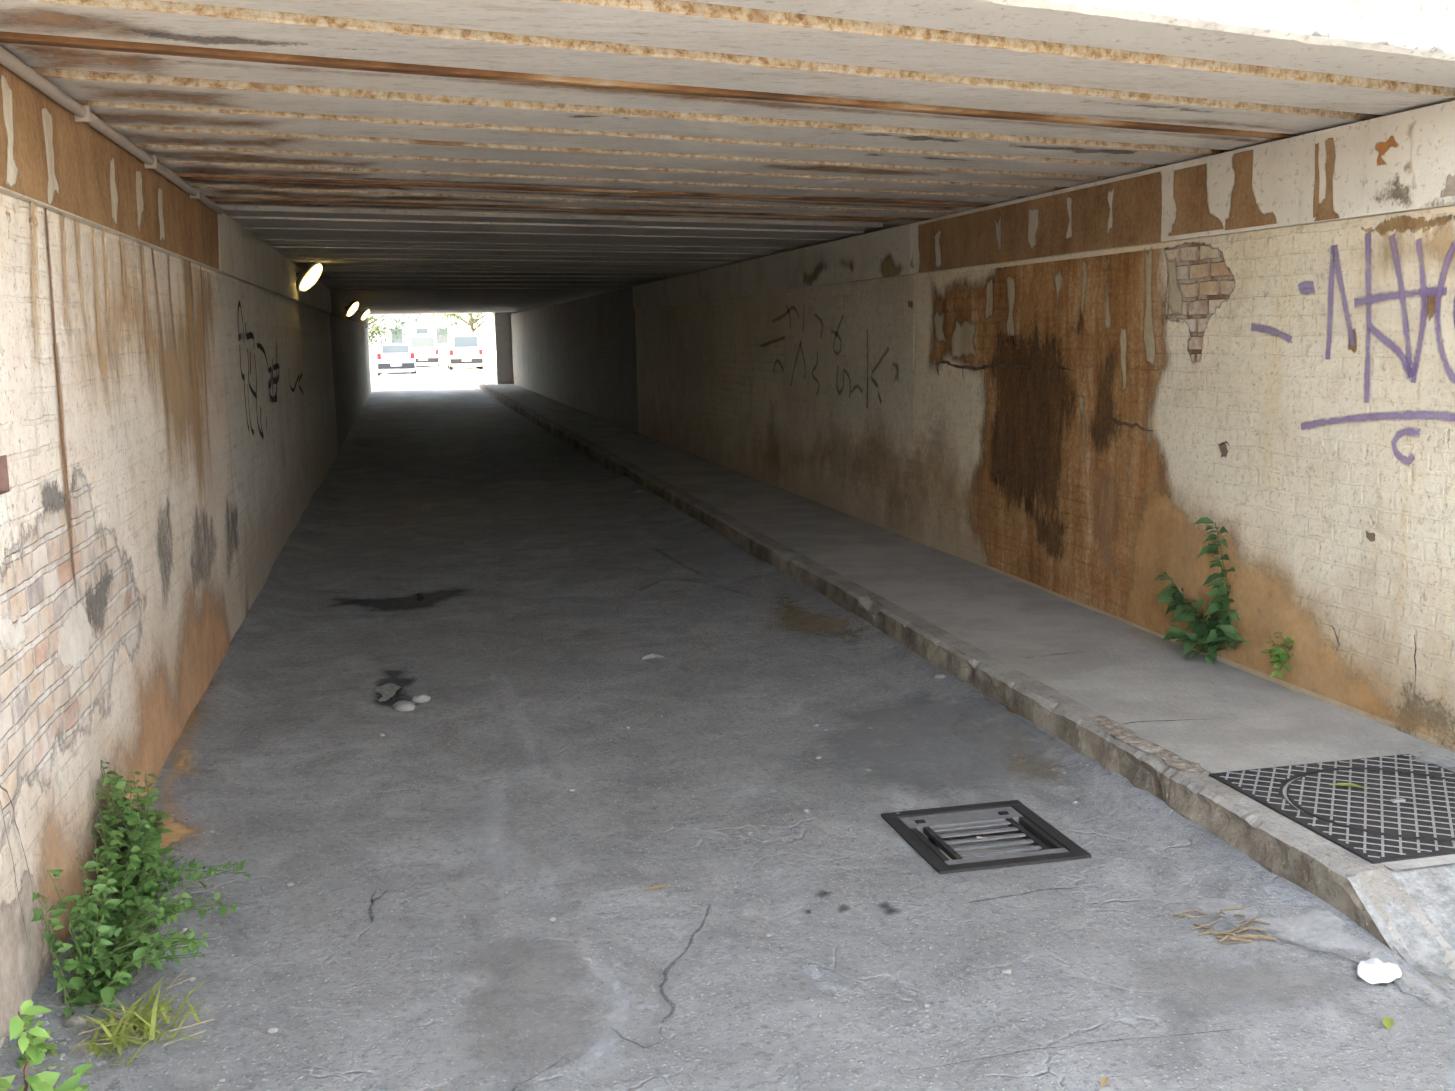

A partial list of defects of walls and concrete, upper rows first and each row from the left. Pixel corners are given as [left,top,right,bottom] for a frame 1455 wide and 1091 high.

rust [4,12,132,34]
rust [1313,138,1339,221]
rust [1361,136,1455,261]
peeling [1165,242,1235,363]
hole [0,455,10,495]
damp [42,478,76,512]
mould [157,499,172,599]
mould [191,503,238,590]
damp [85,563,113,637]
peeling [0,469,146,849]
flaking render [0,870,45,1039]
crack [611,907,709,1048]